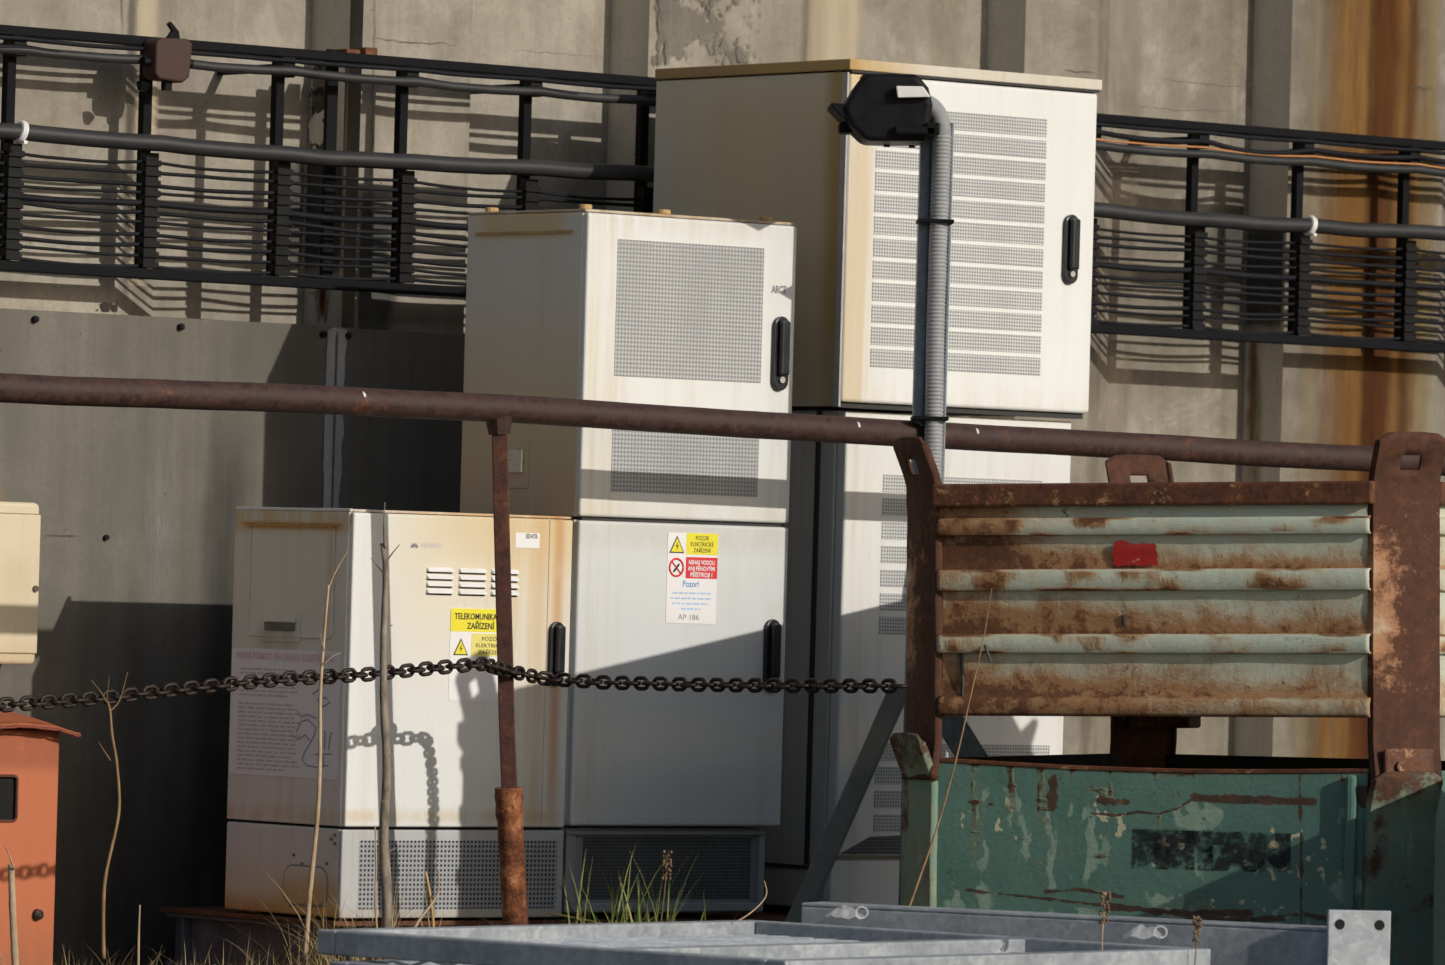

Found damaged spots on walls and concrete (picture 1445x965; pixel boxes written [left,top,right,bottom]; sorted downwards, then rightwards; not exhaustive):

peeling [652,0,762,66]
rust [1326,0,1433,446]
rust [1336,470,1369,481]
rust [939,717,1370,774]